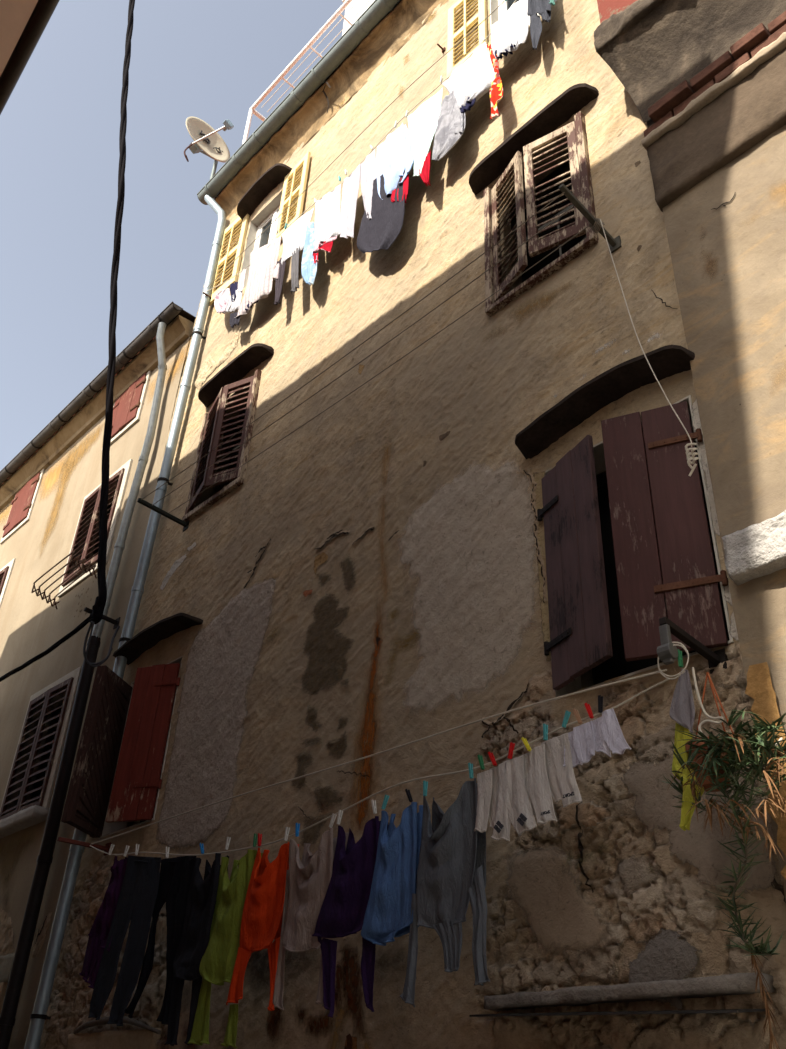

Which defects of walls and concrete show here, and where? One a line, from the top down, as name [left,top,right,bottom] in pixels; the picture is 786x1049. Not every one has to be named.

crack [244,537,272,588]
leakage [341,556,355,591]
leakage [292,574,352,845]
rust [354,617,382,827]